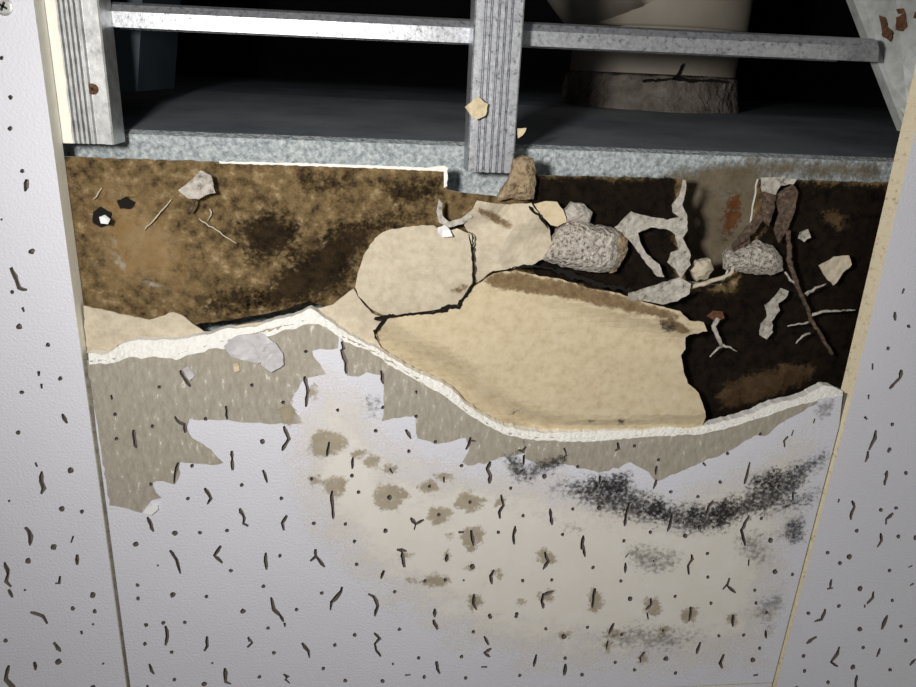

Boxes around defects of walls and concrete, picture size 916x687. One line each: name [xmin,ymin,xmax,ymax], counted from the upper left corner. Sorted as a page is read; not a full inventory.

corrosion [879,8,916,41]
leakage [103,189,185,287]
leakage [205,176,441,317]
spalling [219,161,448,188]
crack [373,232,475,340]
leakage [479,208,511,227]
crack [529,206,548,228]
leakage [485,162,886,421]
peeling [87,305,843,515]
leakage [279,384,825,668]